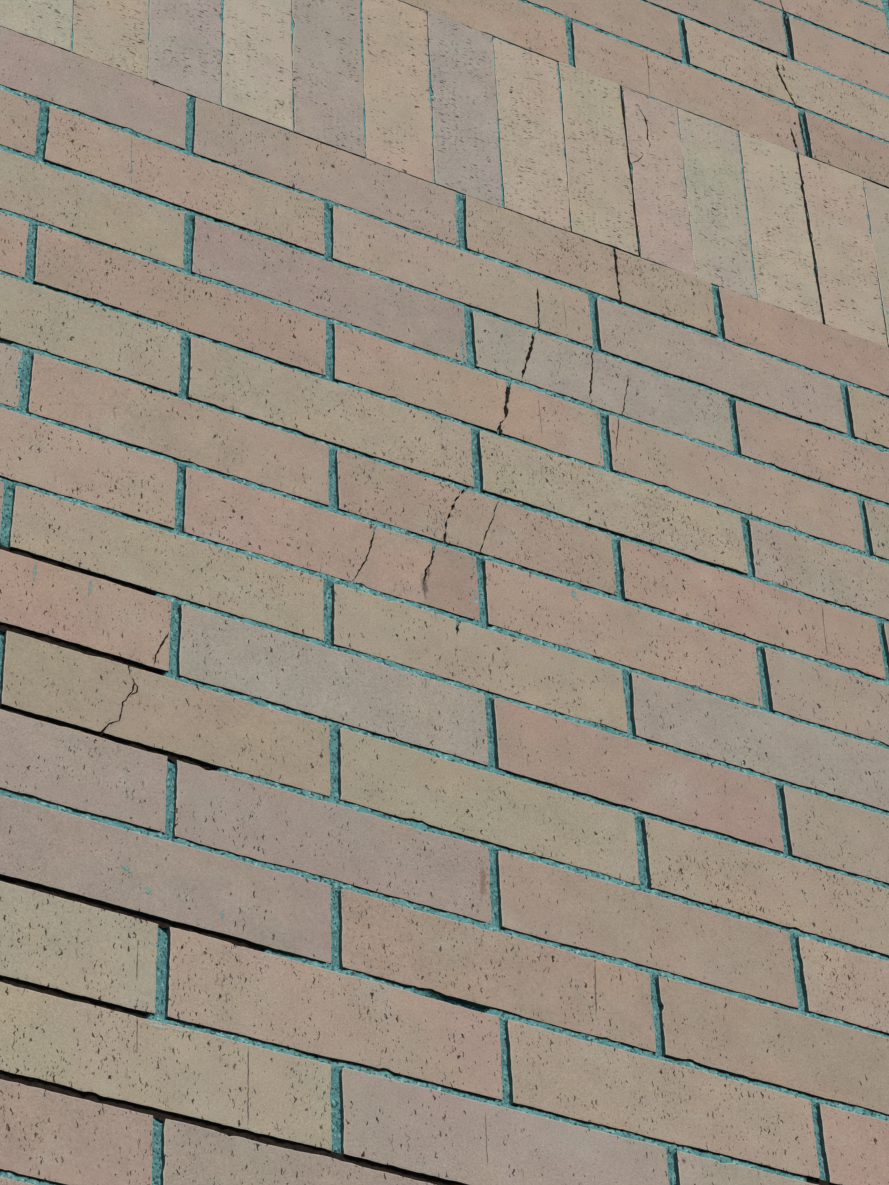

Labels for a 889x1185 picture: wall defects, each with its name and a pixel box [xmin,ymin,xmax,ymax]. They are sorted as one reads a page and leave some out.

crack [776,2,825,324]
crack [496,291,567,434]
crack [355,533,374,578]
crack [423,490,466,582]
crack [99,632,169,735]